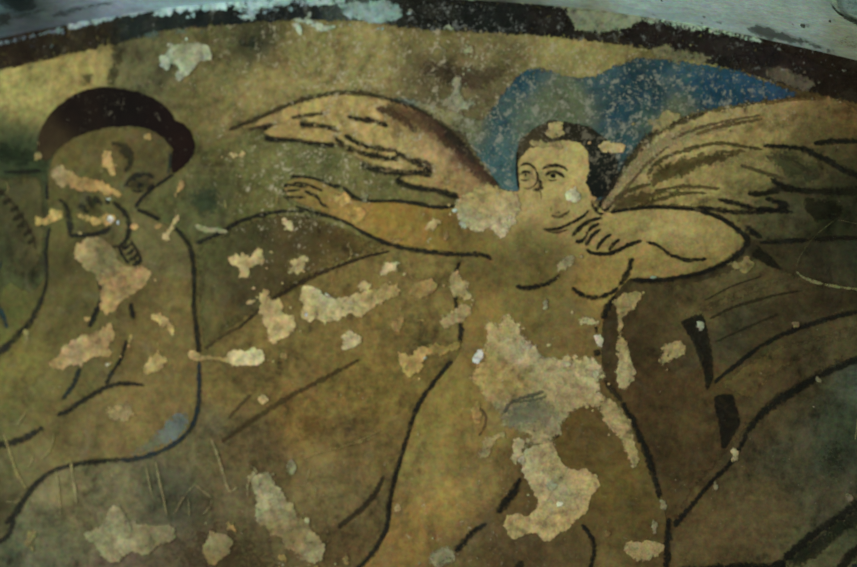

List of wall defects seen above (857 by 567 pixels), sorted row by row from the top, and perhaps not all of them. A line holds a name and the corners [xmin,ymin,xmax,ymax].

flaking render [159,29,212,82]
flaking render [51,150,122,200]
flaking render [77,213,119,226]
flaking render [424,183,521,241]
flaking render [228,247,273,278]
flaking render [49,232,157,371]
flaking render [188,261,475,367]
flaking render [398,341,460,380]
flaking render [469,291,645,542]
flaking render [84,505,176,563]
flaking render [247,471,326,567]
flaking render [624,520,665,562]